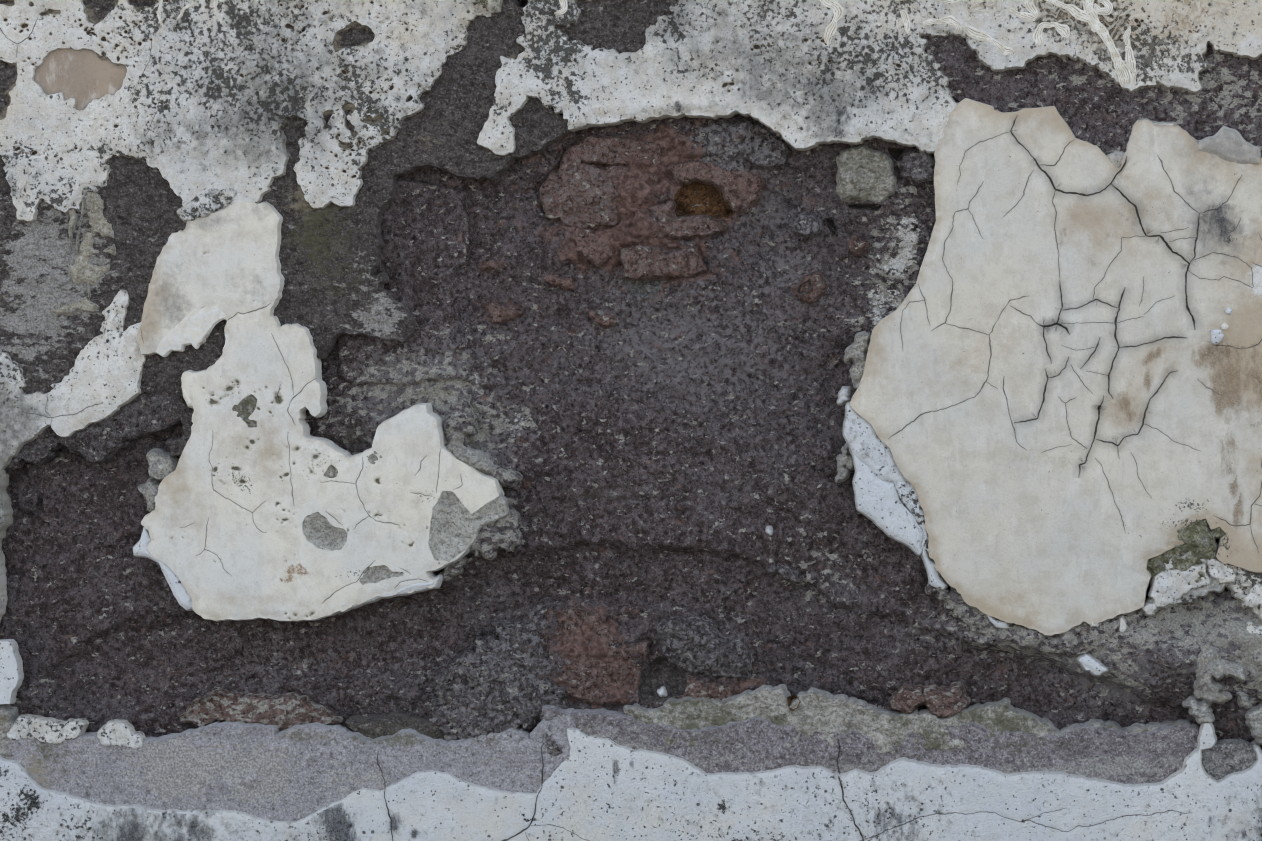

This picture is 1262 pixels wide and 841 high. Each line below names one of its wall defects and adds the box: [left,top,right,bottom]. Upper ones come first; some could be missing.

spalling [0,60,18,120]
spalling [0,0,61,16]
peeling [555,0,679,54]
peeling [260,0,573,359]
crack [892,117,1262,530]
crack [186,440,264,574]
crack [202,305,313,504]
crack [326,458,397,526]
spalling [0,114,1262,784]
crack [1215,463,1262,549]
peeling [7,677,639,821]
crack [837,740,1186,841]